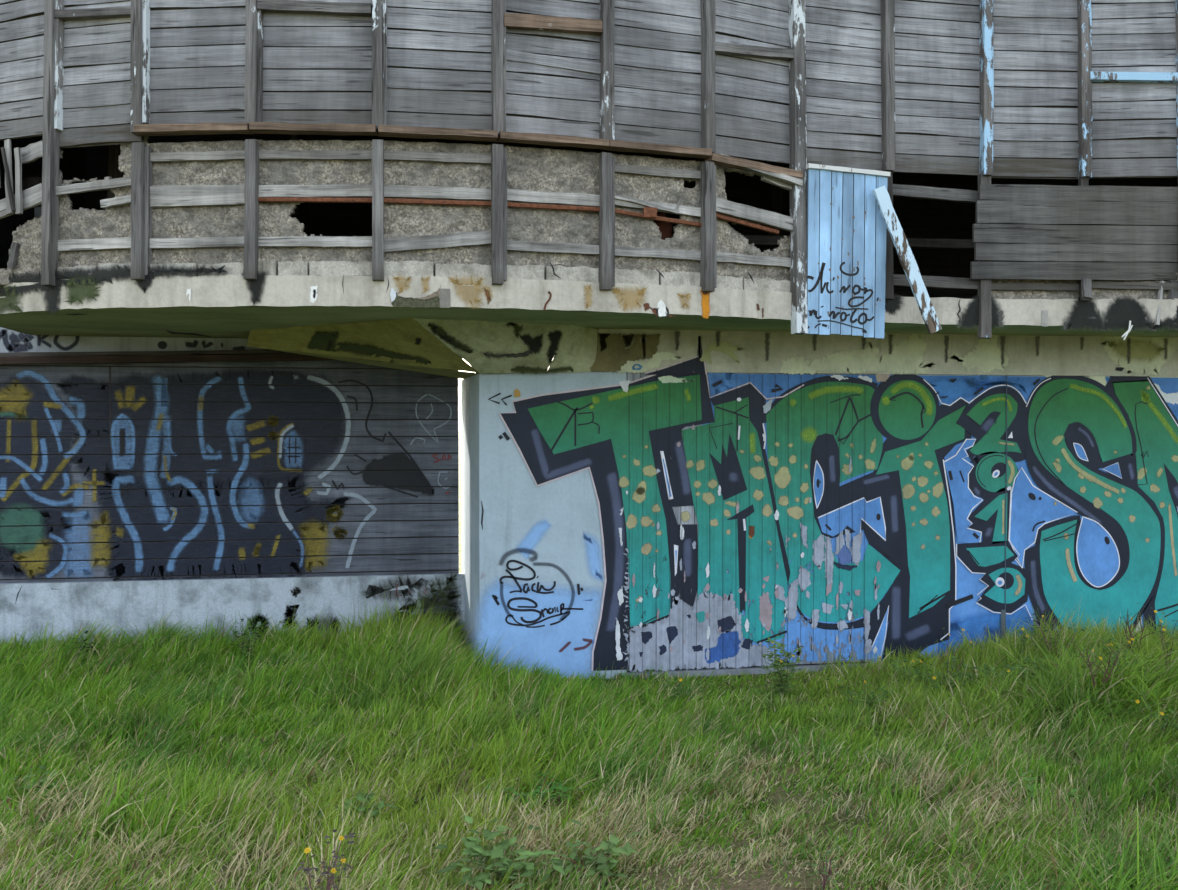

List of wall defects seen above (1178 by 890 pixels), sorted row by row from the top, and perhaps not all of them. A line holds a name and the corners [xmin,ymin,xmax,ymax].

damp [958,297,1003,327]
damp [1063,298,1178,331]
peeling [780,333,935,382]
peeling [950,335,1009,374]
peeling [1085,336,1178,405]
peeling [615,491,881,672]